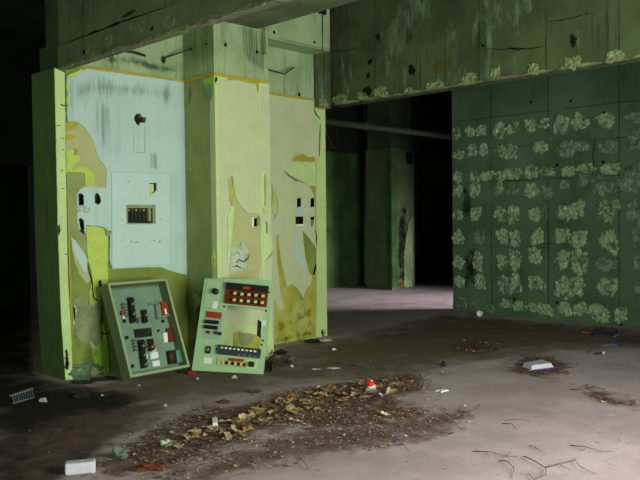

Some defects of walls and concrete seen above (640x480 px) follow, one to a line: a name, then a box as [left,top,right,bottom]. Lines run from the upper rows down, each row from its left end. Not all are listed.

crack [486,44,545,52]
peeling [58,0,290,379]
peeling [285,154,316,230]
peeling [221,171,326,355]
damp [398,209,407,281]
damp [464,251,479,286]